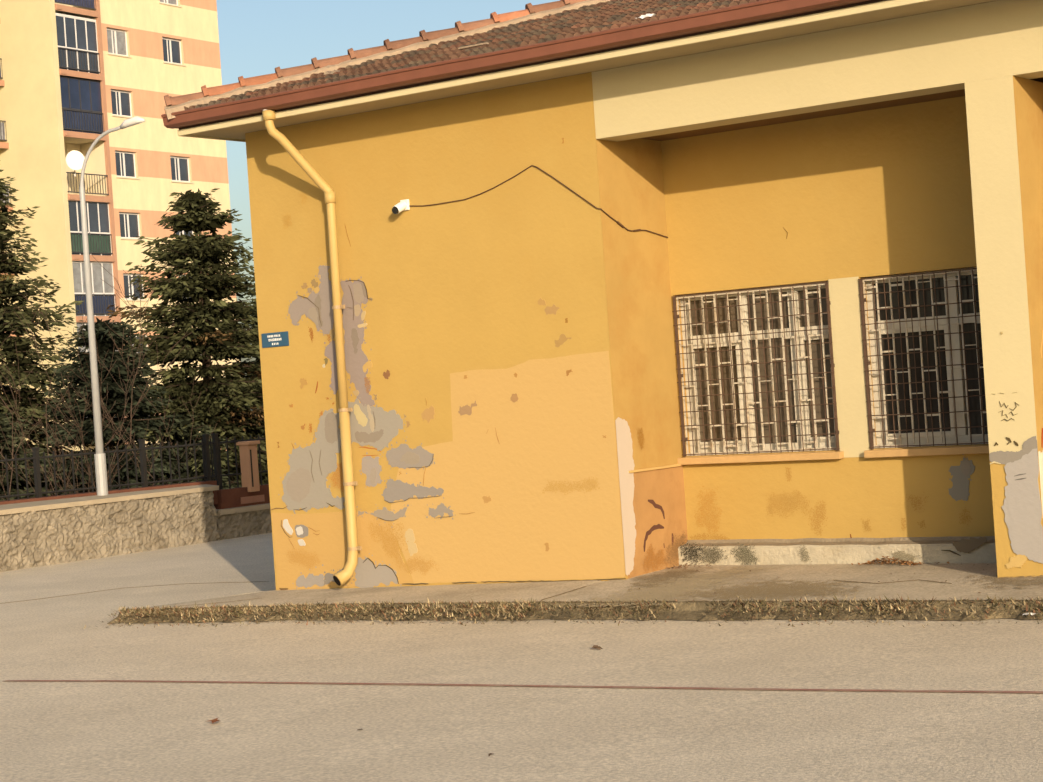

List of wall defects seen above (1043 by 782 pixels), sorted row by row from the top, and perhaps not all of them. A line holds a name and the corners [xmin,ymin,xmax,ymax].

peeling [277,258,456,556]
peeling [948,454,975,503]
peeling [279,553,401,590]